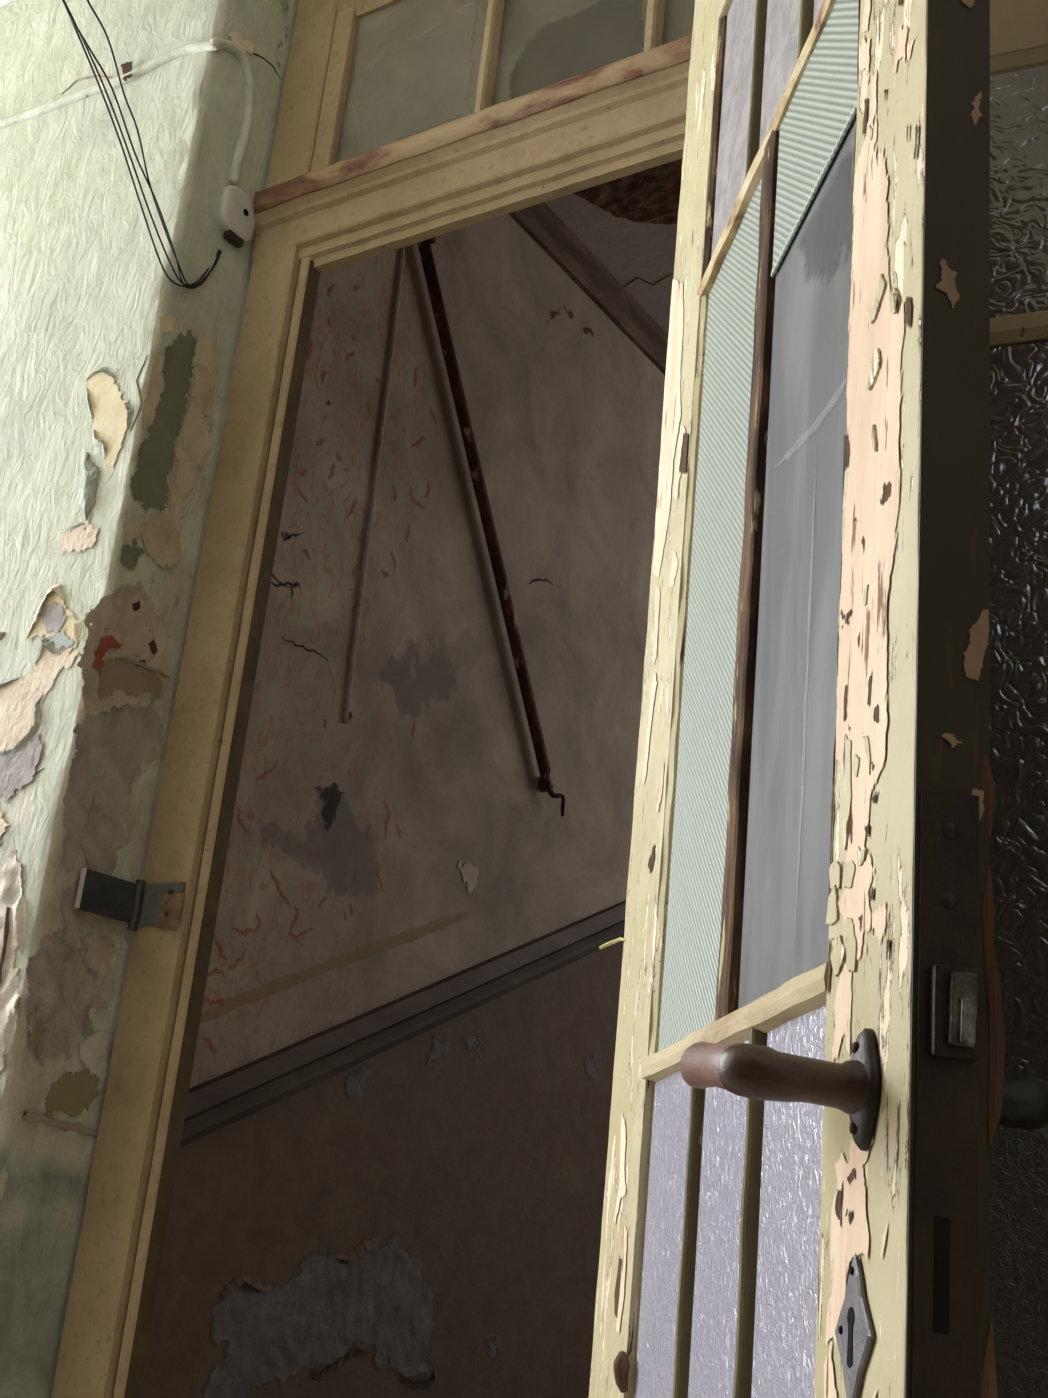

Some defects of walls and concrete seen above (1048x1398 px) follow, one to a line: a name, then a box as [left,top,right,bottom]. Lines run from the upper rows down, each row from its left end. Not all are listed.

flaking render [574,158,683,225]
flaking render [0,314,217,1118]
peeling [204,1232,438,1398]